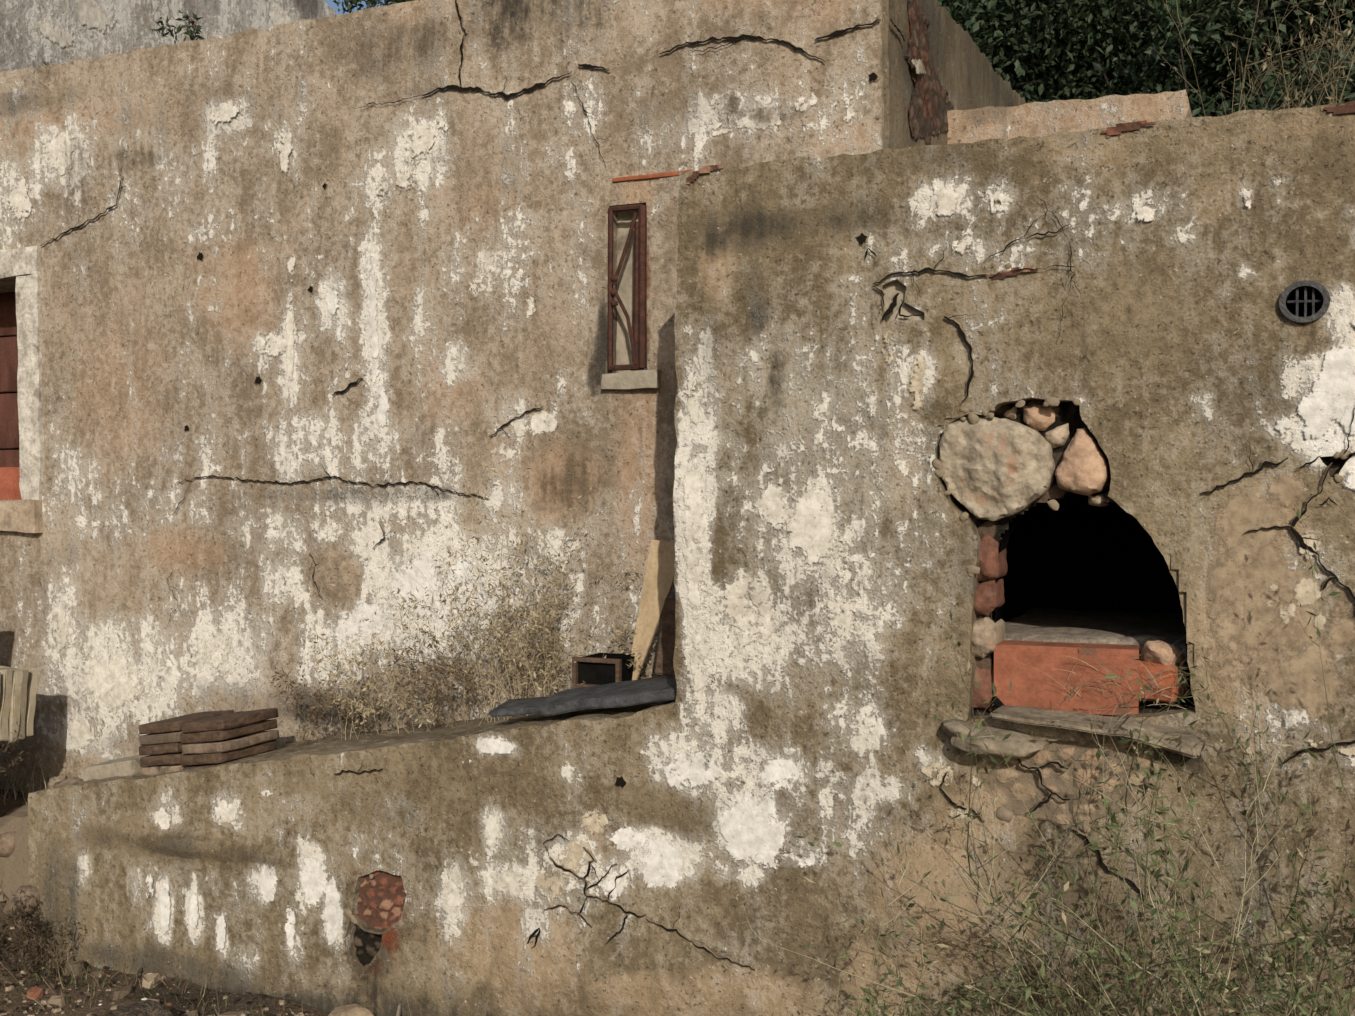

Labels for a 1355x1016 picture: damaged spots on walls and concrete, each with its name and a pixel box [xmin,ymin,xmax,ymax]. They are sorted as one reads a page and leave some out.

crack [355,0,613,163]
crack [659,18,905,62]
crack [865,193,1083,404]
peeling [1275,343,1355,489]
crack [172,464,488,516]
peeling [327,549,507,654]
flaking render [932,397,1131,716]
crack [1202,408,1355,600]
flaking render [1205,474,1355,721]
peeling [717,756,820,869]
peeling [258,857,411,979]
crack [527,834,755,970]